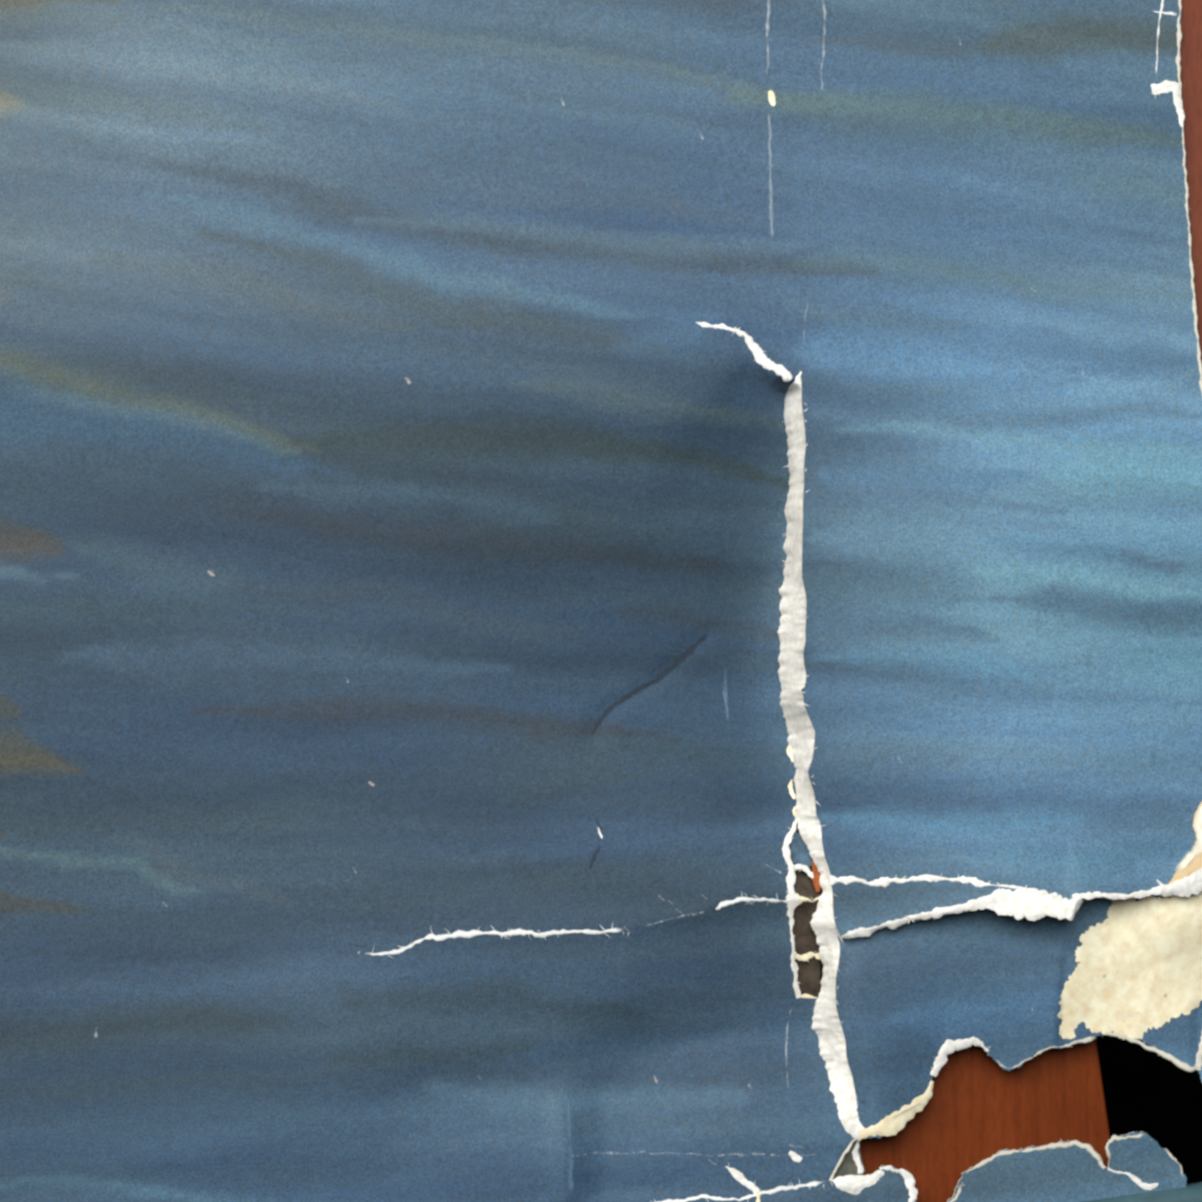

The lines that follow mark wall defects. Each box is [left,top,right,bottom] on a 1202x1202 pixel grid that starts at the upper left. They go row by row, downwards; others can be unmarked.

peeling [1057,802,1202,1040]
peeling [832,1170,884,1195]